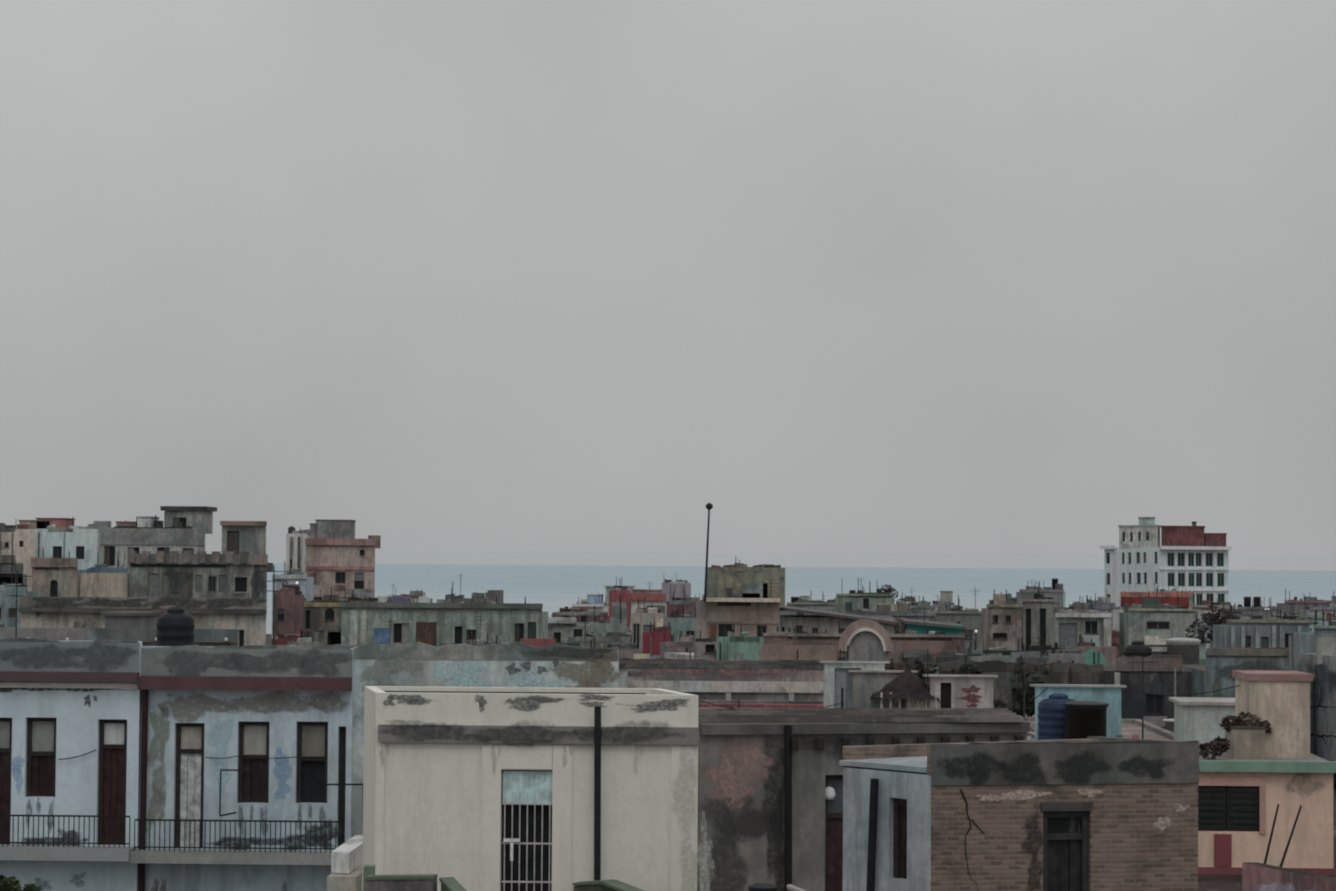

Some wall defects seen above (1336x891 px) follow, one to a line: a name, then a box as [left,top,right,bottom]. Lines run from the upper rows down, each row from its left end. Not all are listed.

damp [0,565,266,672]
damp [705,743,784,891]
crack [960,789,984,889]